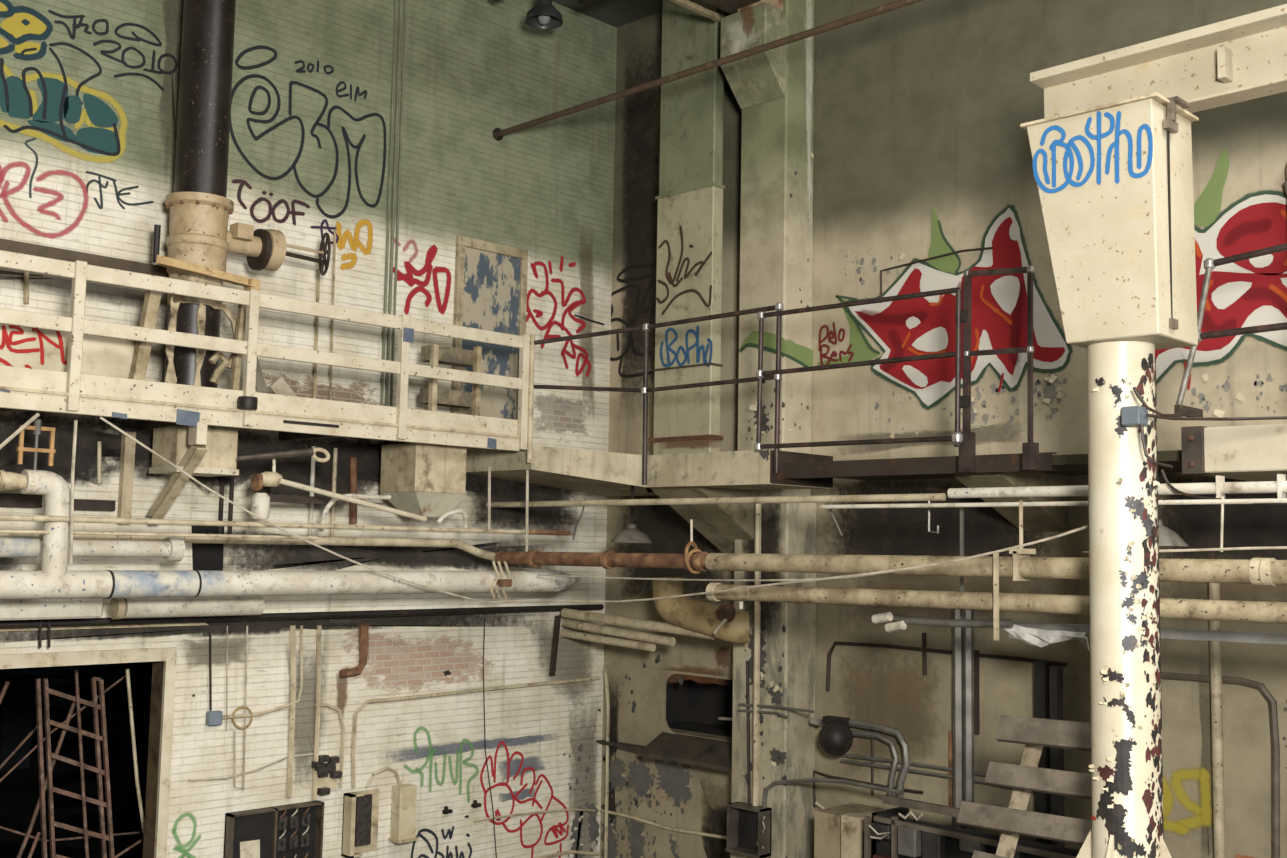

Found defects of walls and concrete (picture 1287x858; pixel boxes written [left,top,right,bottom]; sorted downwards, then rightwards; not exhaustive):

peeling [942,373,1067,431]
peeling [1191,373,1287,417]
peeling [1089,353,1164,858]
flaking render [343,631,489,692]